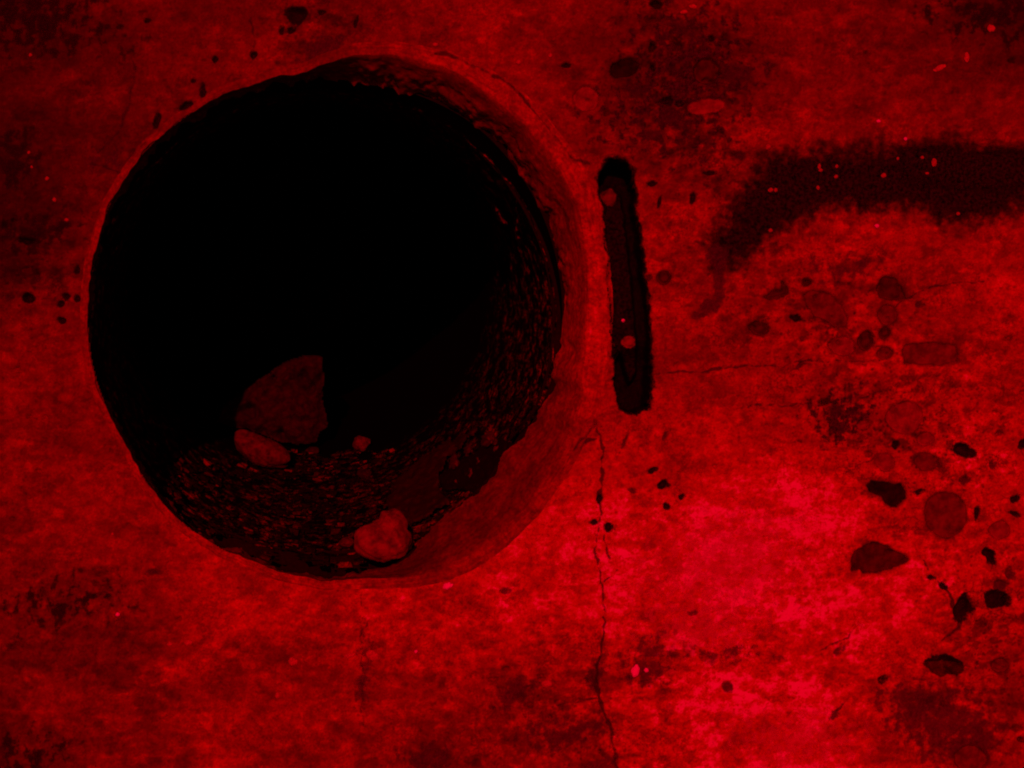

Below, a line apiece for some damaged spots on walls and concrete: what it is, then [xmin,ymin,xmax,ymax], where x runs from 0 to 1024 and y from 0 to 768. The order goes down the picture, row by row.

damp [692,135,1024,319]
crack [563,429,618,768]